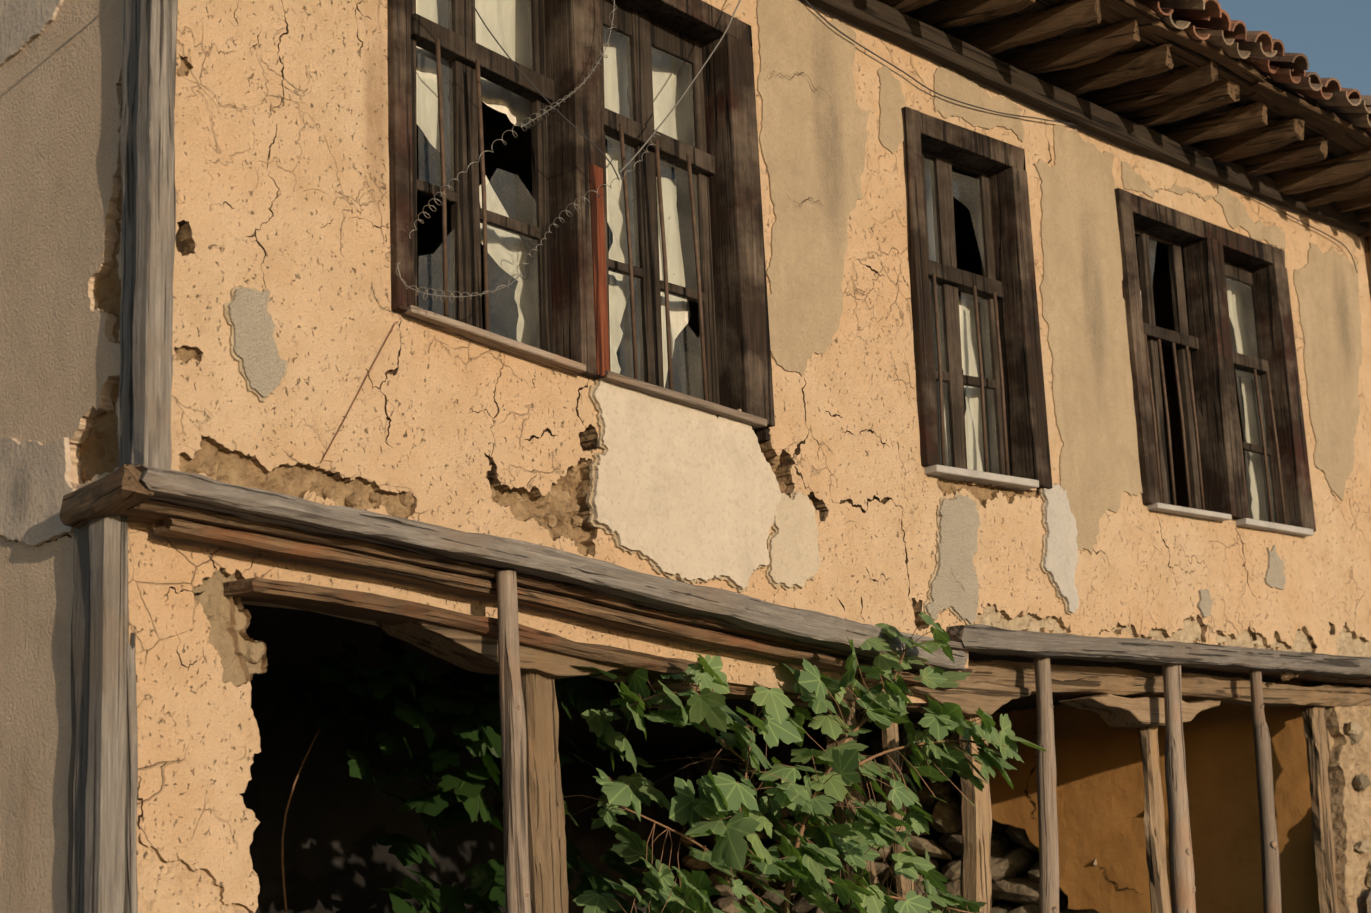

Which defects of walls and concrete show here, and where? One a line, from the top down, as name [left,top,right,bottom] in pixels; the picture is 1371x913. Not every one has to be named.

crack [355,0,372,56]
crack [214,0,289,289]
peeling [933,67,1024,143]
spalling [179,434,417,519]
crack [366,320,402,448]
crack [467,354,589,484]
peeling [484,379,820,592]
crack [783,379,912,621]
peeling [923,124,1286,633]
peeling [1293,242,1363,501]
spalling [192,567,268,687]
spalling [1099,589,1317,653]